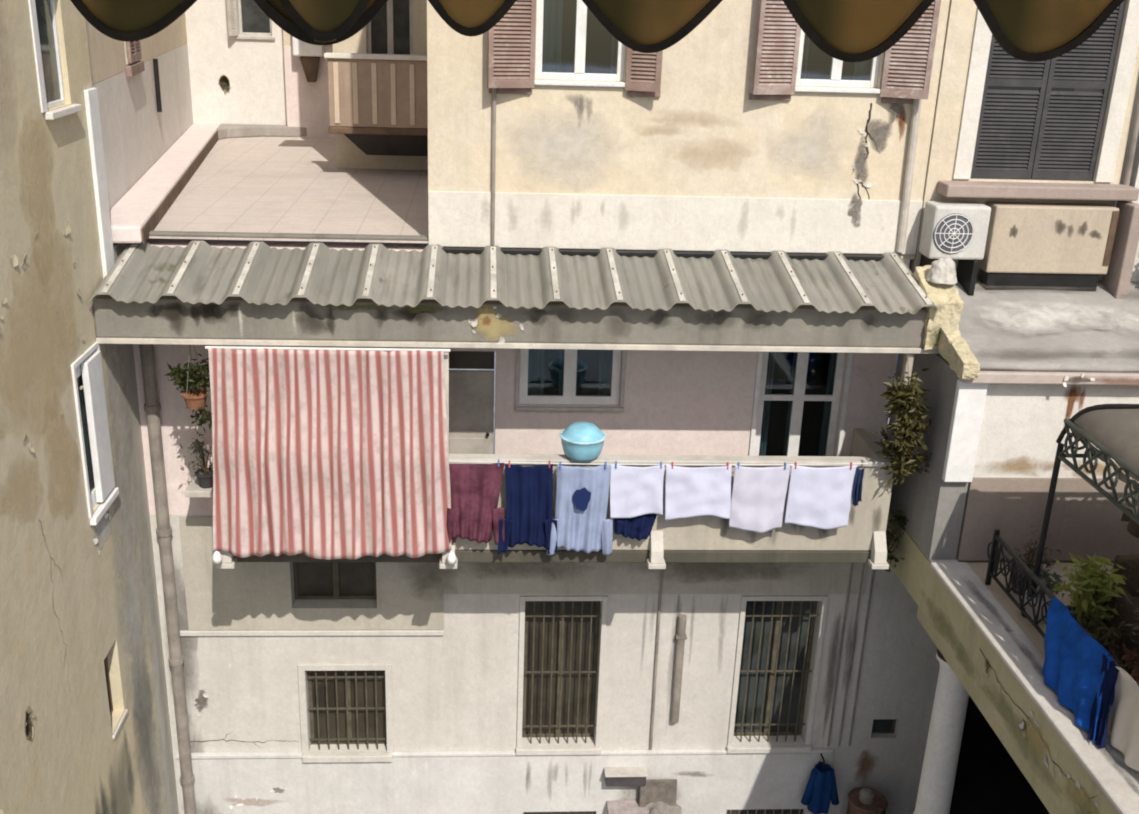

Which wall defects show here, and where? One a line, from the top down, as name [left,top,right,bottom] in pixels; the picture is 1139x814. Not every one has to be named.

crack [851,103,880,199]
spalling [468,306,524,343]
corrosion [1066,388,1085,418]
spalling [25,706,36,742]
crack [980,649,1098,814]